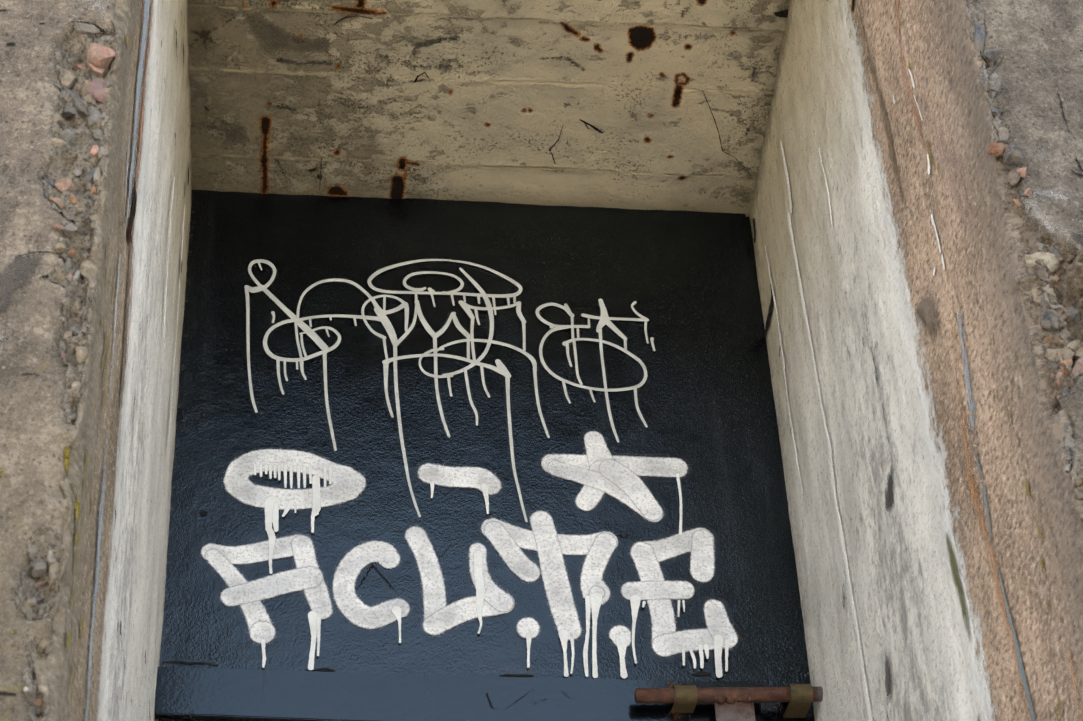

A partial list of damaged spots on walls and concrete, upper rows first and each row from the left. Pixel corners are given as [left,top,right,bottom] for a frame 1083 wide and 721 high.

rust [332,0,386,15]
rust [626,26,656,62]
rust [659,72,690,108]
rust [259,102,272,194]
rust [389,157,420,199]